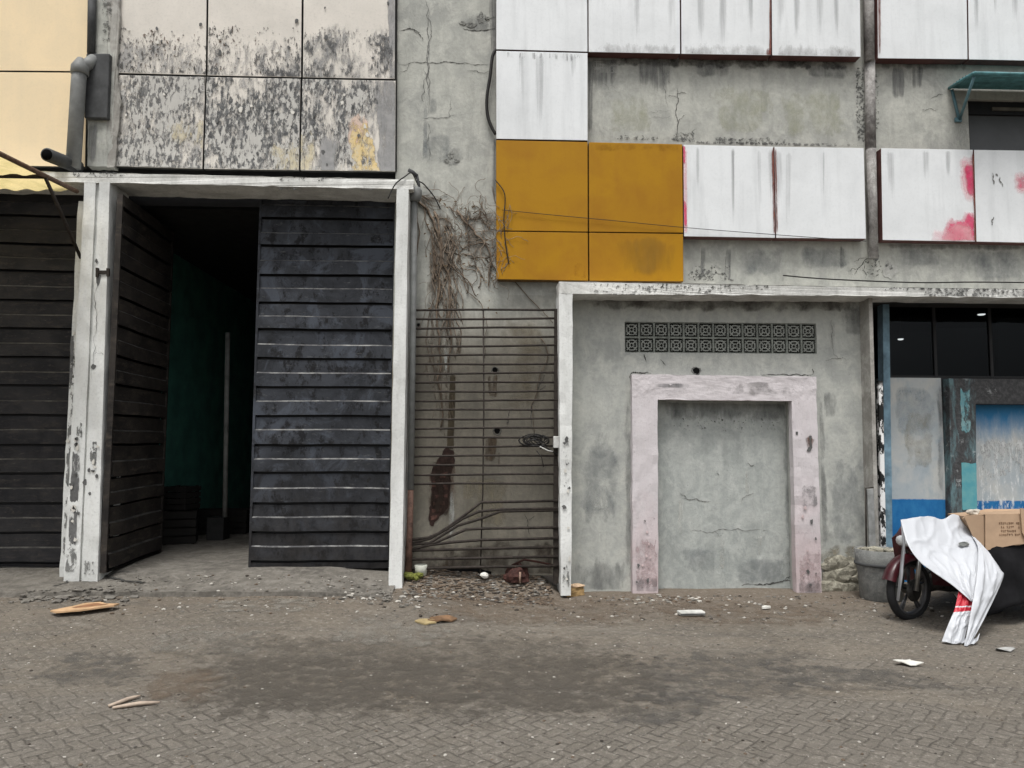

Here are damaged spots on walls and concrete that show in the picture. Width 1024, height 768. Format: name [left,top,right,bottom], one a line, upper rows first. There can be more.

crack [399,3,488,164]
crack [649,66,693,135]
peeling [63,332,99,574]